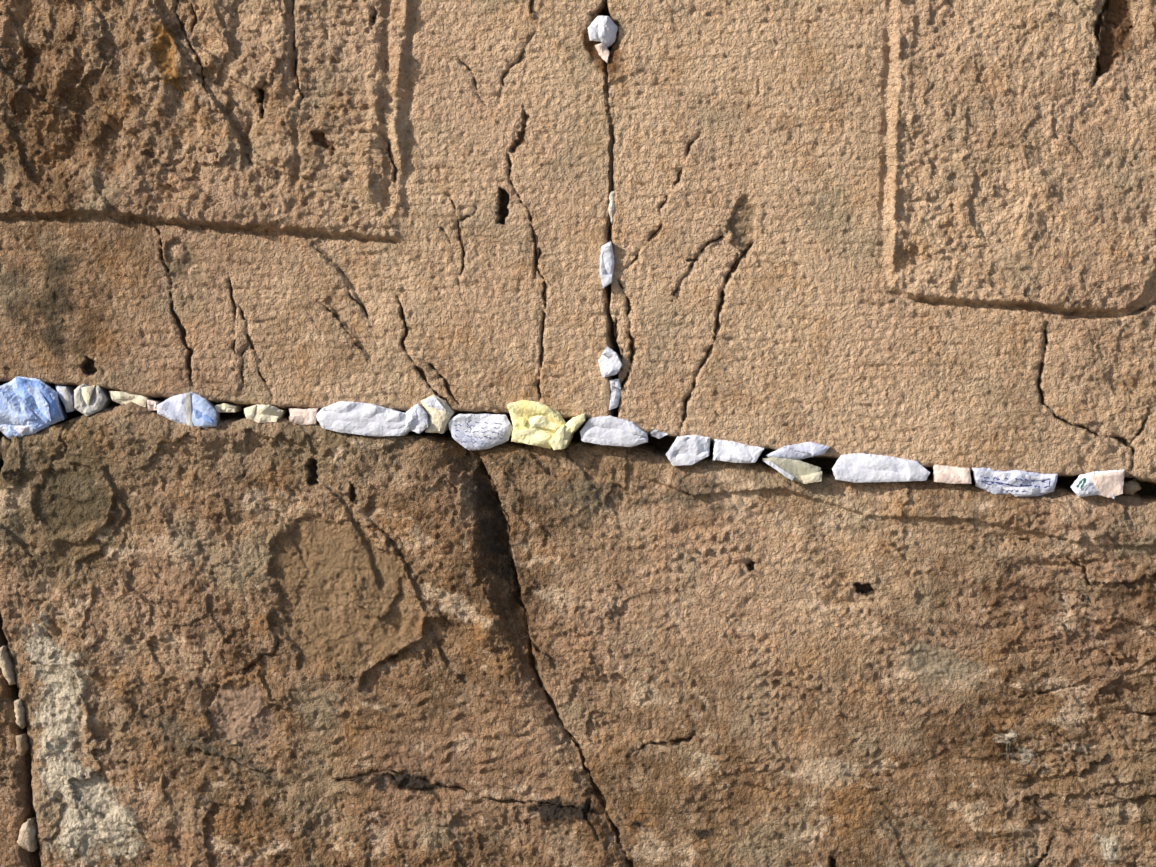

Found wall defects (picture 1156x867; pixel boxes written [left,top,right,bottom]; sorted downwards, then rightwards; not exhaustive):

crack [176,0,206,91]
crack [461,51,524,90]
spalling [1085,0,1133,76]
crack [155,228,193,381]
crack [230,281,265,382]
crack [399,303,453,401]
crack [508,157,546,394]
crack [673,236,752,420]
crack [1038,330,1147,453]
crack [332,458,633,867]